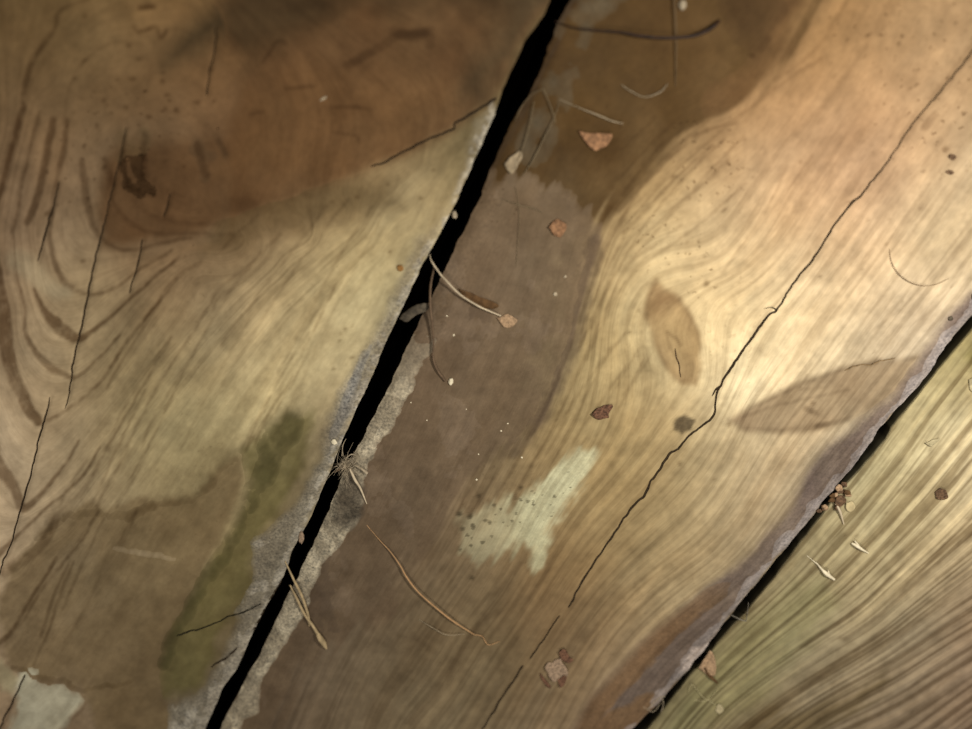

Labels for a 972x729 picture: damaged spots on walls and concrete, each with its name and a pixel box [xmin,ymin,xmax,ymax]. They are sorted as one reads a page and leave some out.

crack [0,127,127,574]
leakage [148,0,227,82]
leakage [0,102,497,729]
leakage [188,0,825,729]
crack [483,52,972,729]